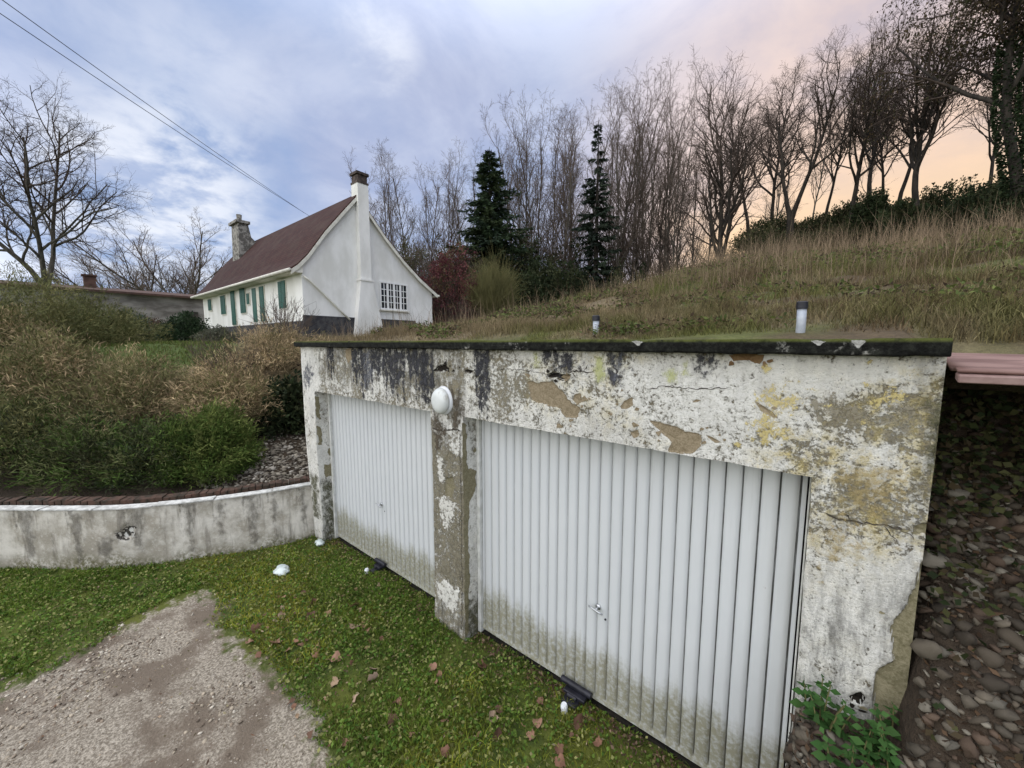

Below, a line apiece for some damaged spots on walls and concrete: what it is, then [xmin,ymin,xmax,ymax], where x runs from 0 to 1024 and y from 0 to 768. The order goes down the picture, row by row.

water stain [351,348,490,450]
peeling [525,365,590,434]
peeling [608,389,726,454]
water stain [922,396,943,470]
hole [116,526,136,540]
water stain [310,475,335,540]
crack [822,510,914,540]
water stain [465,599,479,637]
spalling [849,562,922,722]